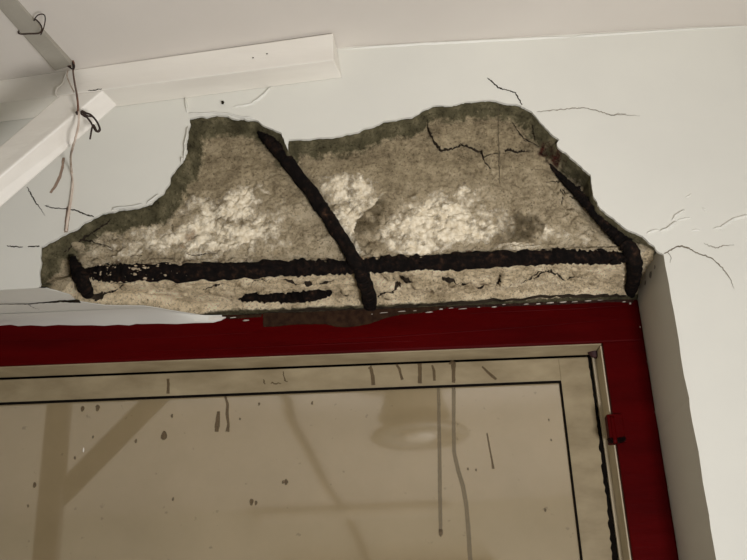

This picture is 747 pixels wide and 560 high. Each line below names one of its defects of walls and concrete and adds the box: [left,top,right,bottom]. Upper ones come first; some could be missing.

crack [427,78,636,183]
rust [538,142,563,168]
spalling [0,101,655,326]
crack [664,243,734,288]